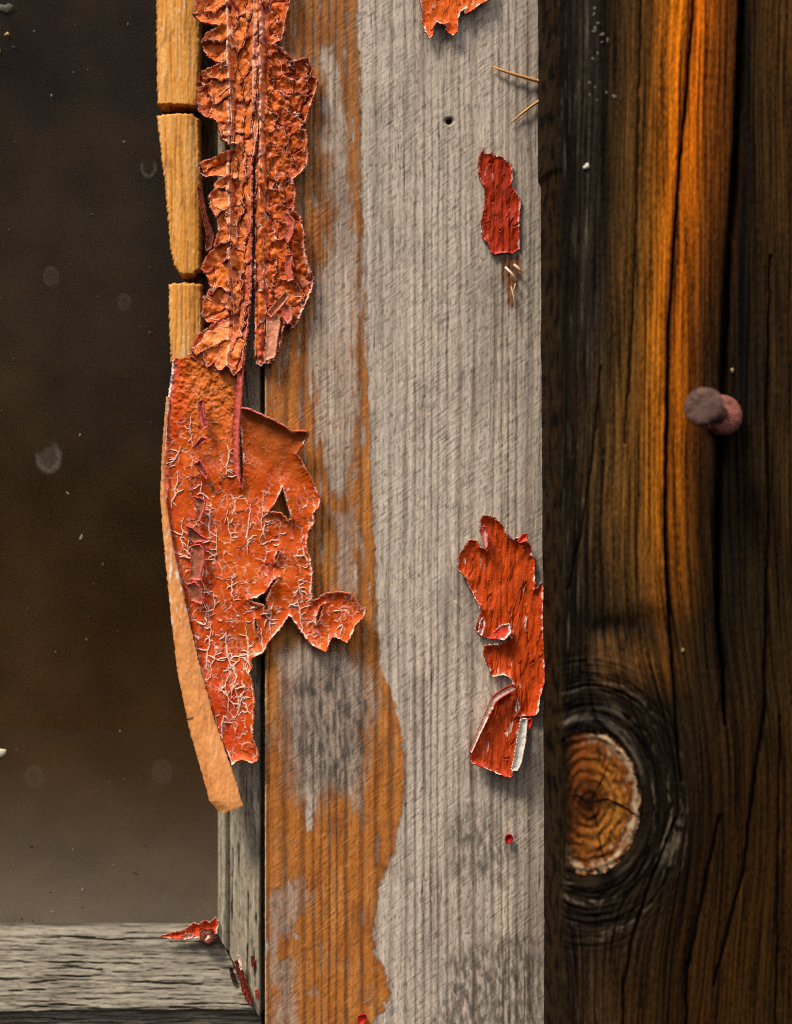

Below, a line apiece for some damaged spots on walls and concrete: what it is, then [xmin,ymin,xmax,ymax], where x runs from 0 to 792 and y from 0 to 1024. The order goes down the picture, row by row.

peeling [419,0,489,39]
peeling [477,148,522,306]
peeling [160,0,368,813]
peeling [456,515,545,778]
peeling [160,917,220,946]